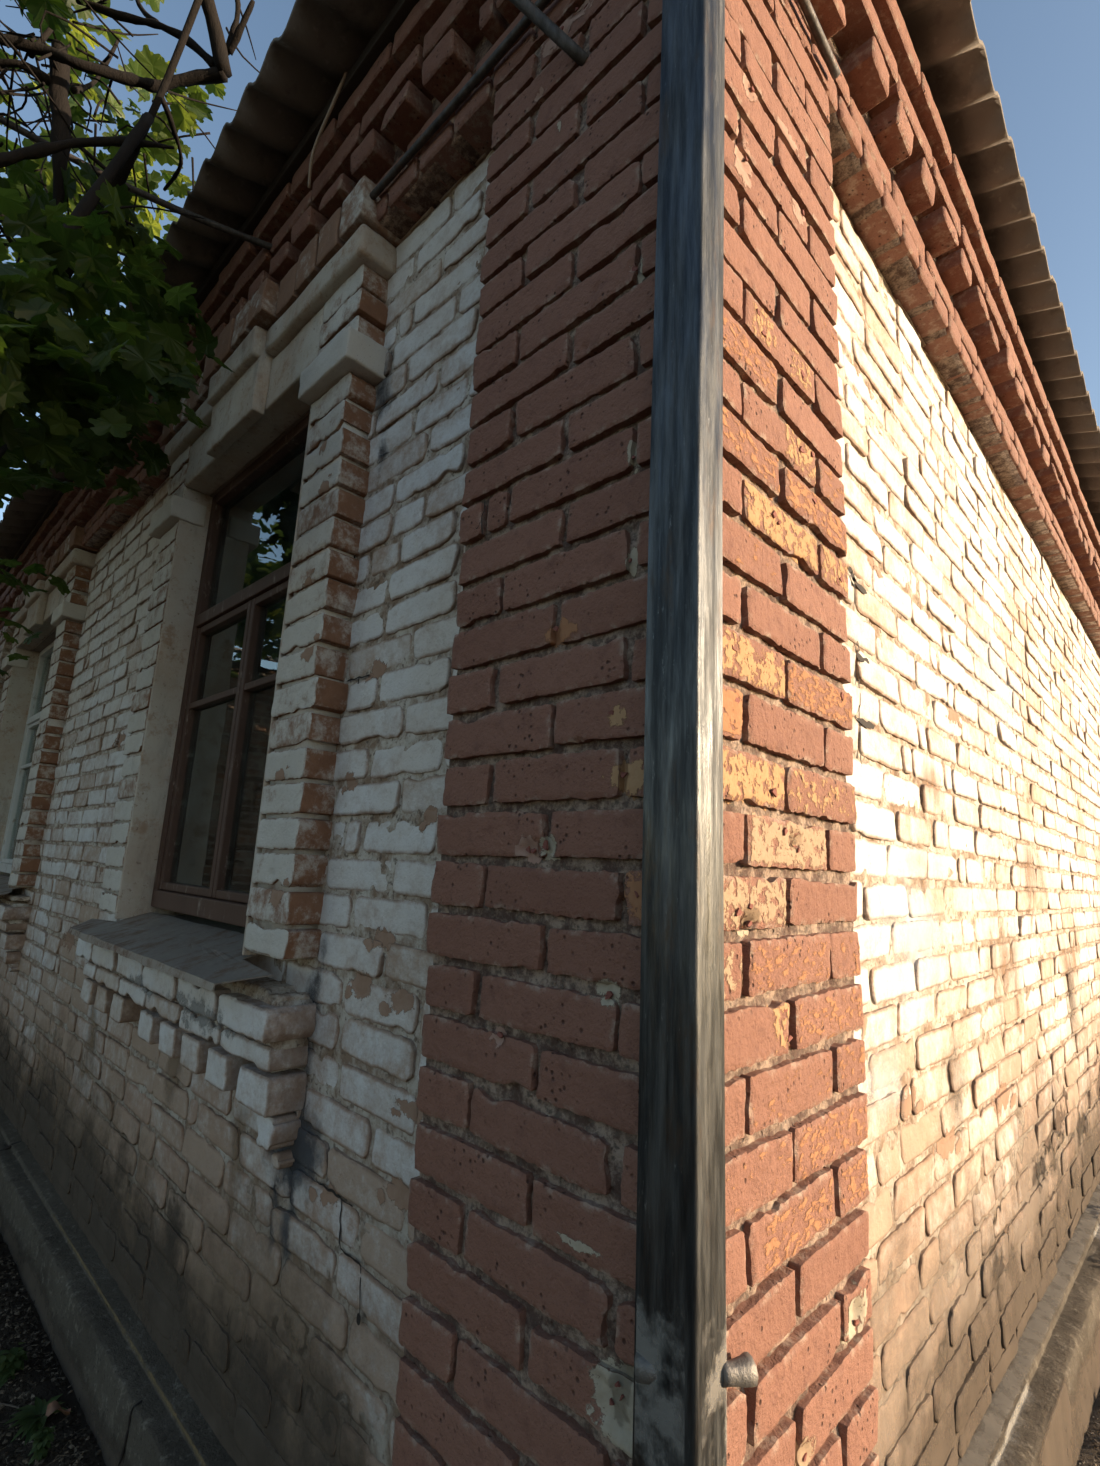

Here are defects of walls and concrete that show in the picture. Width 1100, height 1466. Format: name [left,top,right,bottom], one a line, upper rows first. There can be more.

peeling [723,407,848,593]
peeling [723,625,869,1274]
water stain [0,1017,363,1466]
spalling [586,1356,634,1458]